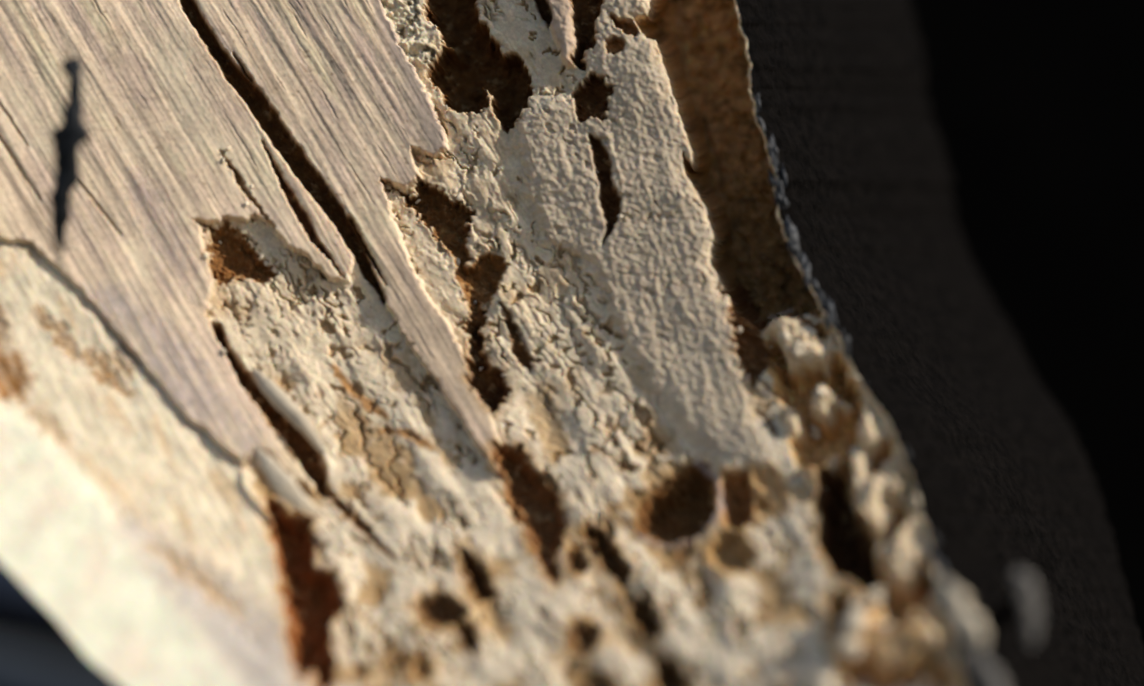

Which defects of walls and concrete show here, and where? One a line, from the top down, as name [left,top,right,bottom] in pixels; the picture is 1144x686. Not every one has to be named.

spalling [422,0,536,136]
spalling [568,0,642,125]
spalling [196,219,281,288]
crack [175,0,391,308]
spalling [380,177,475,247]
spalling [461,301,513,415]
spalling [720,284,781,393]
spalling [267,501,344,686]
spalling [414,548,497,654]
spalling [491,445,685,686]
spalling [814,460,883,607]
spalling [406,655,436,685]